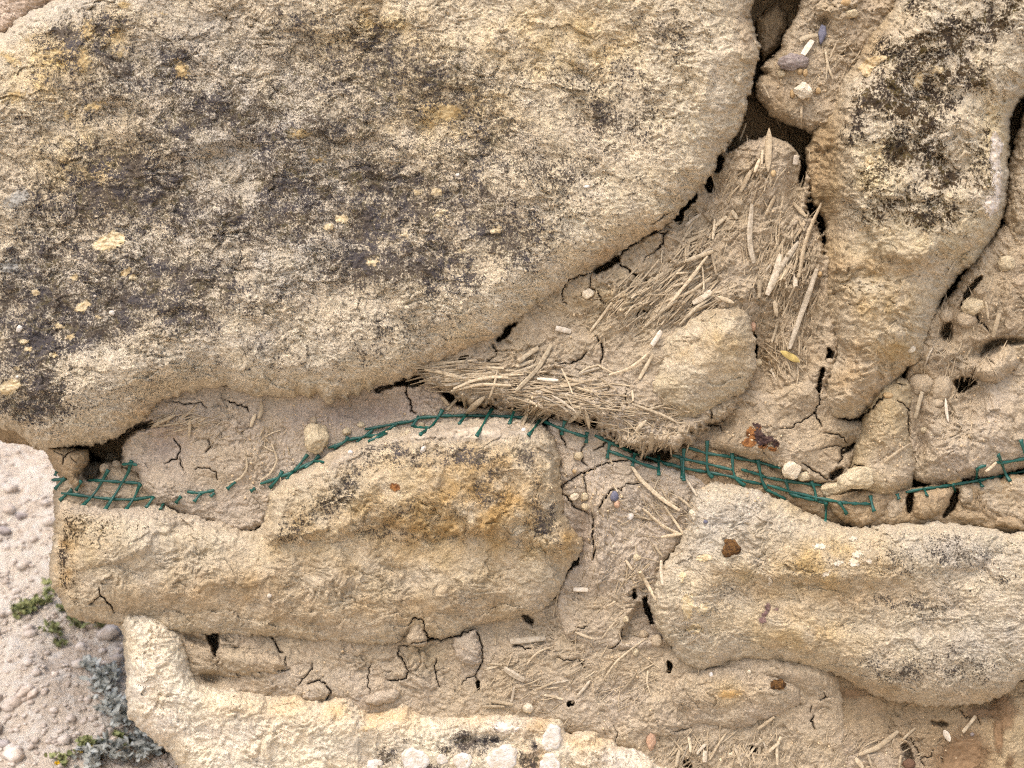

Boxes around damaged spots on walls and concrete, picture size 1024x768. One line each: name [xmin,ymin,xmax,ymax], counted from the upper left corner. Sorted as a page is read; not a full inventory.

crack [561,273,604,303]
crack [619,211,685,318]
crack [167,440,218,480]
crack [560,425,639,559]
crack [781,382,910,480]
crack [367,617,484,691]